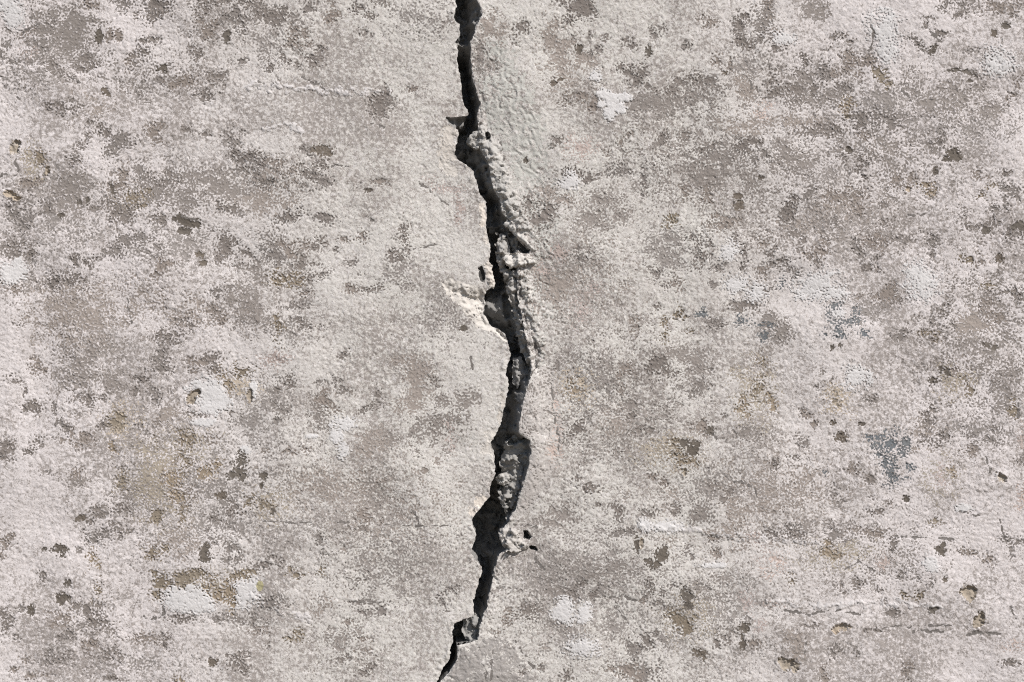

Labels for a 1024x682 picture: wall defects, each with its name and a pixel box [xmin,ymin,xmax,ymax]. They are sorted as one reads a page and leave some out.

crack [229,0,560,682]